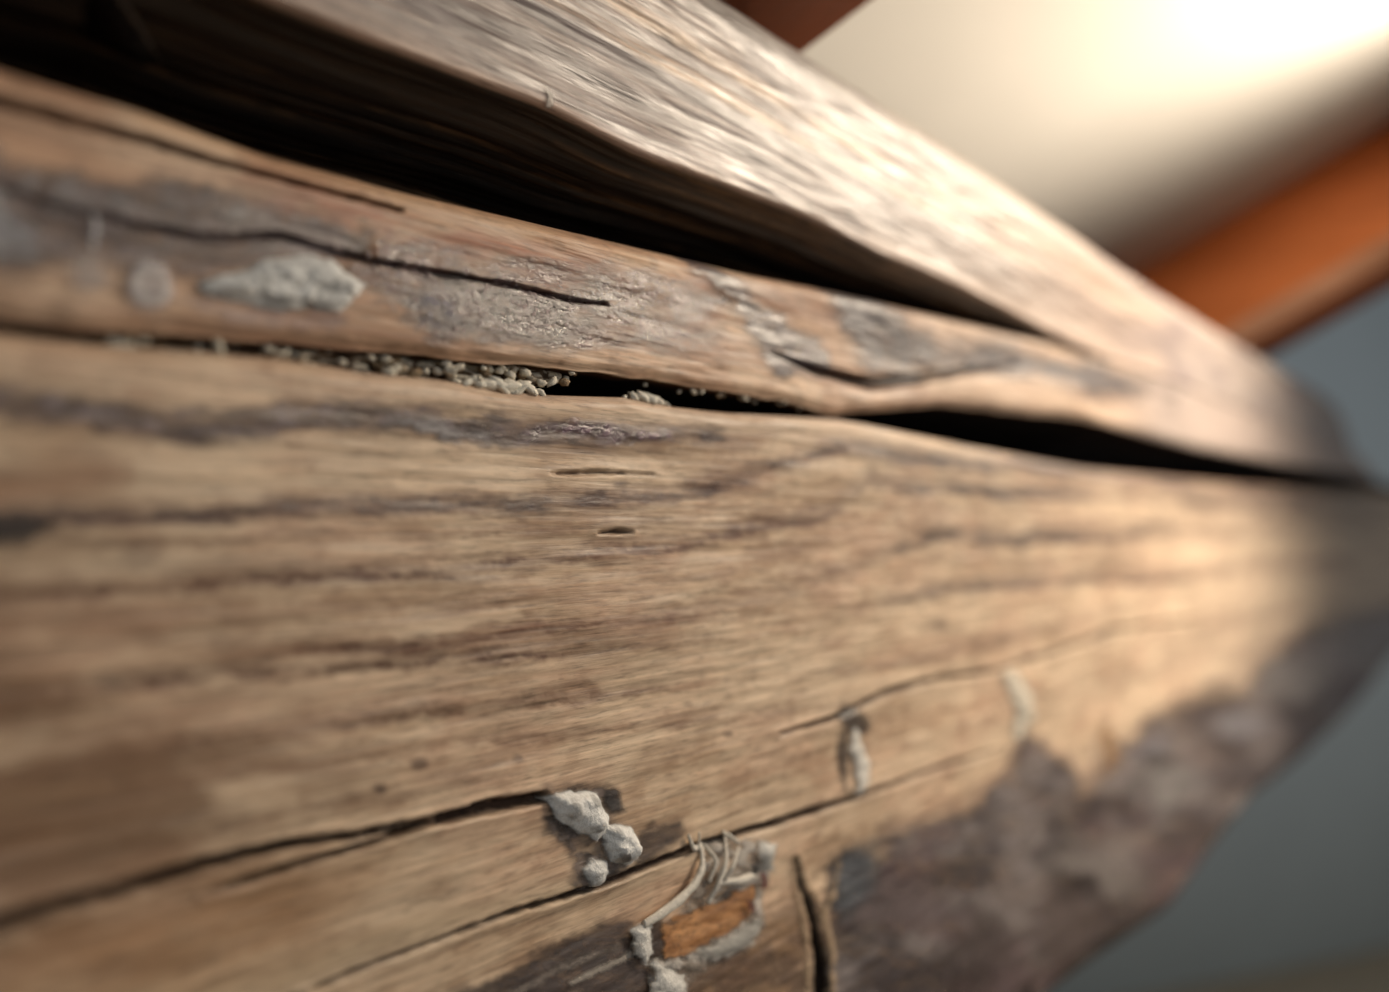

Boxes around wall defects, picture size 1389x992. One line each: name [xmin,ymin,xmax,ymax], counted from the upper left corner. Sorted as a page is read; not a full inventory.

leakage [0,168,831,377]
crack [0,323,1368,492]
crack [779,674,968,734]
crack [0,792,542,932]
crack [452,785,886,932]
crack [792,856,841,992]
leakage [461,609,1389,992]